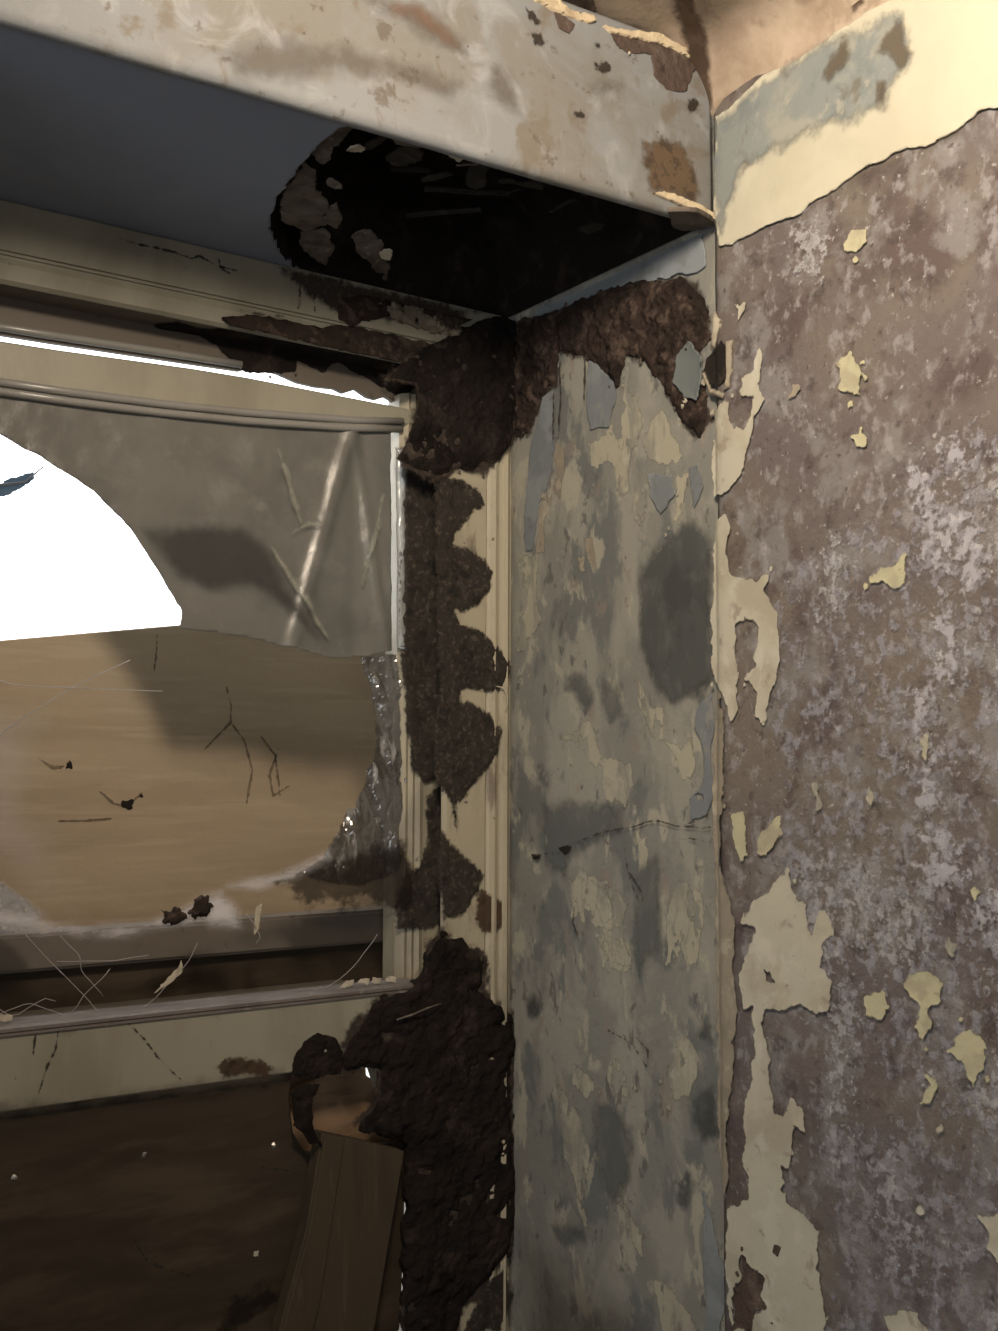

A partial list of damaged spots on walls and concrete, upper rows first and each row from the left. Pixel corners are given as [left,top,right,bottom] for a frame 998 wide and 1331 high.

water stain [527,9,544,45]
water stain [594,43,611,73]
peeling [534,0,998,316]
flaking render [279,126,498,281]
peeling [835,351,867,408]
peeling [586,310,765,551]
peeling [863,553,907,590]
water stain [639,524,713,701]
peeling [635,514,834,1331]
peeling [864,990,889,1020]
peeling [903,971,943,1052]
peeling [947,1017,990,1087]